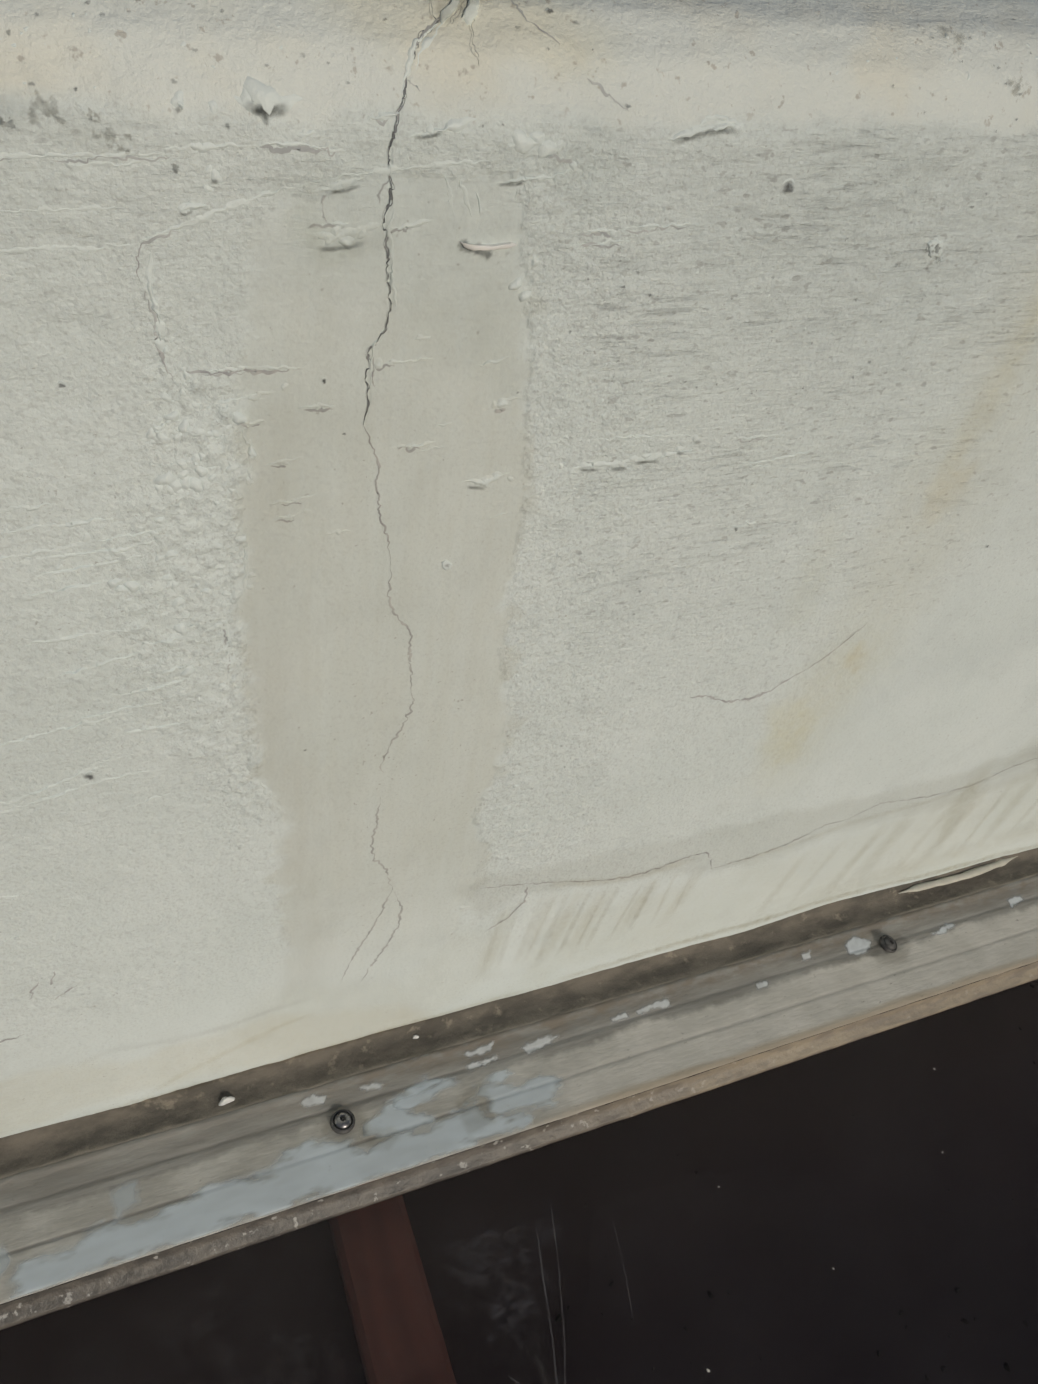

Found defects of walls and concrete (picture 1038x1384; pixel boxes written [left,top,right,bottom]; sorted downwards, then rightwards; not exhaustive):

crack [511,0,560,44]
crack [340,0,479,983]
crack [485,758,1037,932]